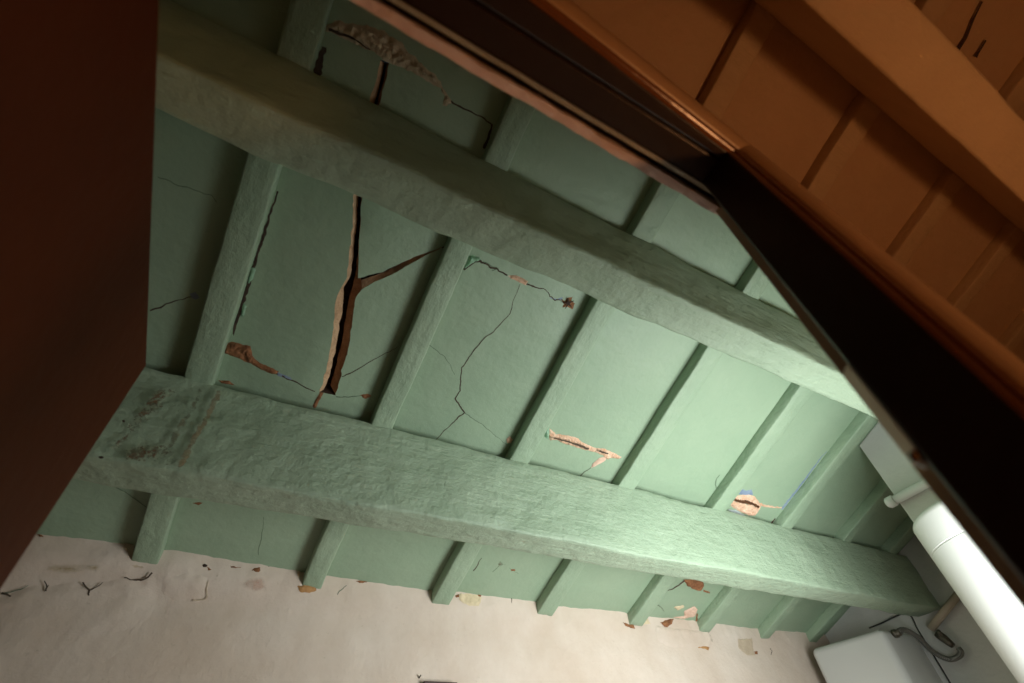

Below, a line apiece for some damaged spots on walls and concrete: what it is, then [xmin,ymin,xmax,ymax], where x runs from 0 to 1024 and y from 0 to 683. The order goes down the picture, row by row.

crack [370,61,389,106]
flaking render [326,20,493,149]
crack [233,191,278,336]
crack [313,194,444,408]
flaking render [225,342,315,392]
crack [429,255,575,445]
flaking render [545,428,621,473]
flaking render [728,490,782,516]
flaking render [668,579,710,593]
peeling [623,605,698,629]